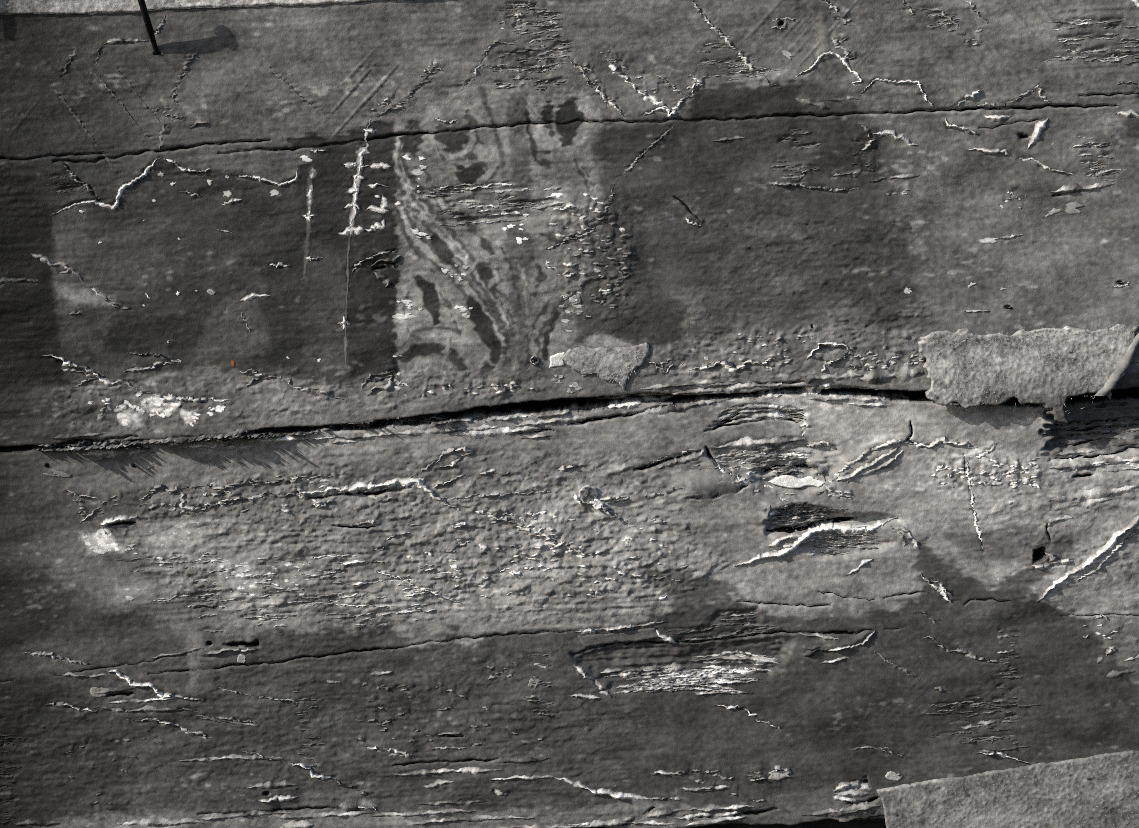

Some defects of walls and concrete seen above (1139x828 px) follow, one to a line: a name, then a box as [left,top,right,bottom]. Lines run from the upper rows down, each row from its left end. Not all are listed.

crack [0,93,1139,163]
leakage [544,126,674,250]
peeling [422,380,534,396]
peeling [549,352,583,393]
peeling [832,422,1139,524]
peeling [891,525,920,549]
spalling [1033,548,1046,561]
peeling [1036,515,1139,602]
peeling [920,573,953,604]